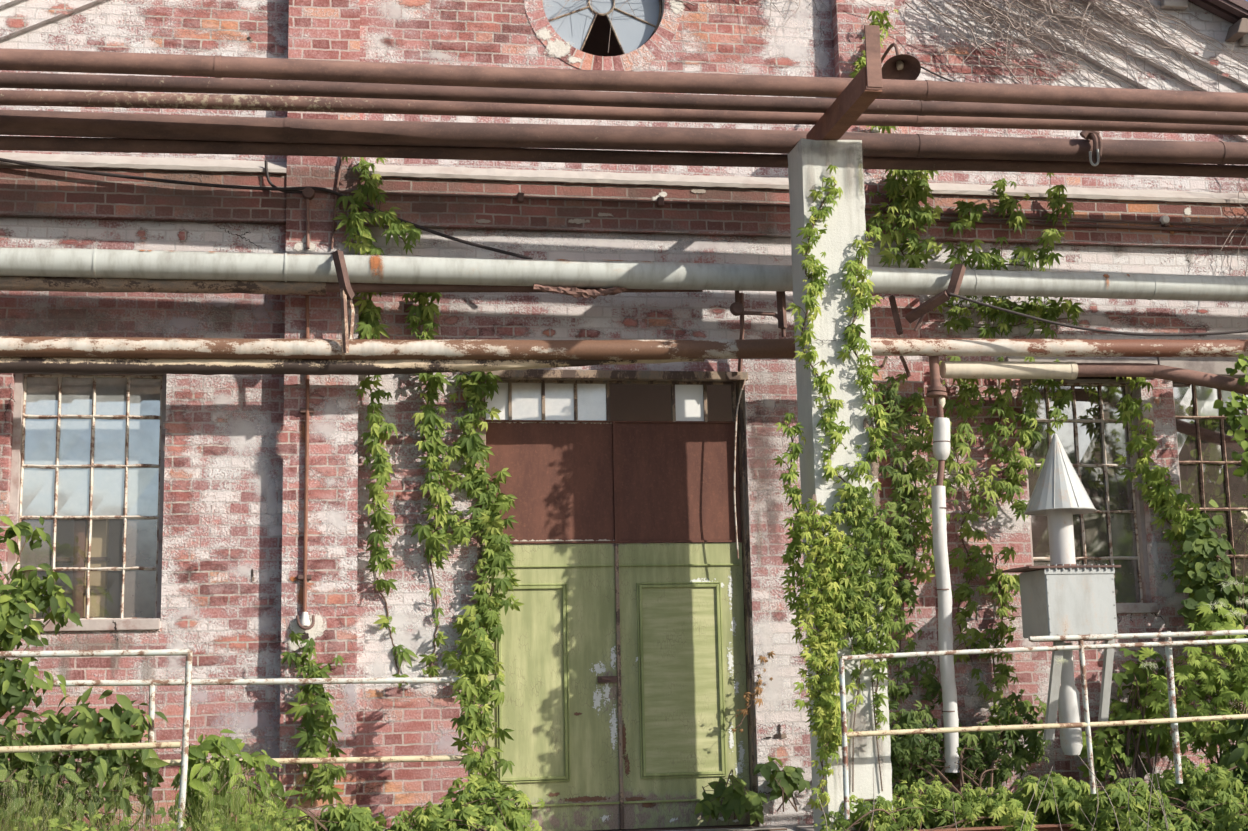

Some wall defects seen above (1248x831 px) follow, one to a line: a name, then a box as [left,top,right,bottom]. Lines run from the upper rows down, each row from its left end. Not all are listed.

peeling [6,14,27,30]
peeling [141,0,289,55]
corrosion [370,255,383,279]
peeling [164,392,230,537]
peeling [276,426,296,459]
peeling [299,458,353,542]
peeling [175,548,274,610]
peeling [175,616,197,628]
peeling [180,559,360,675]
spalling [690,576,739,695]
spalling [589,646,618,751]
spalling [728,723,745,780]